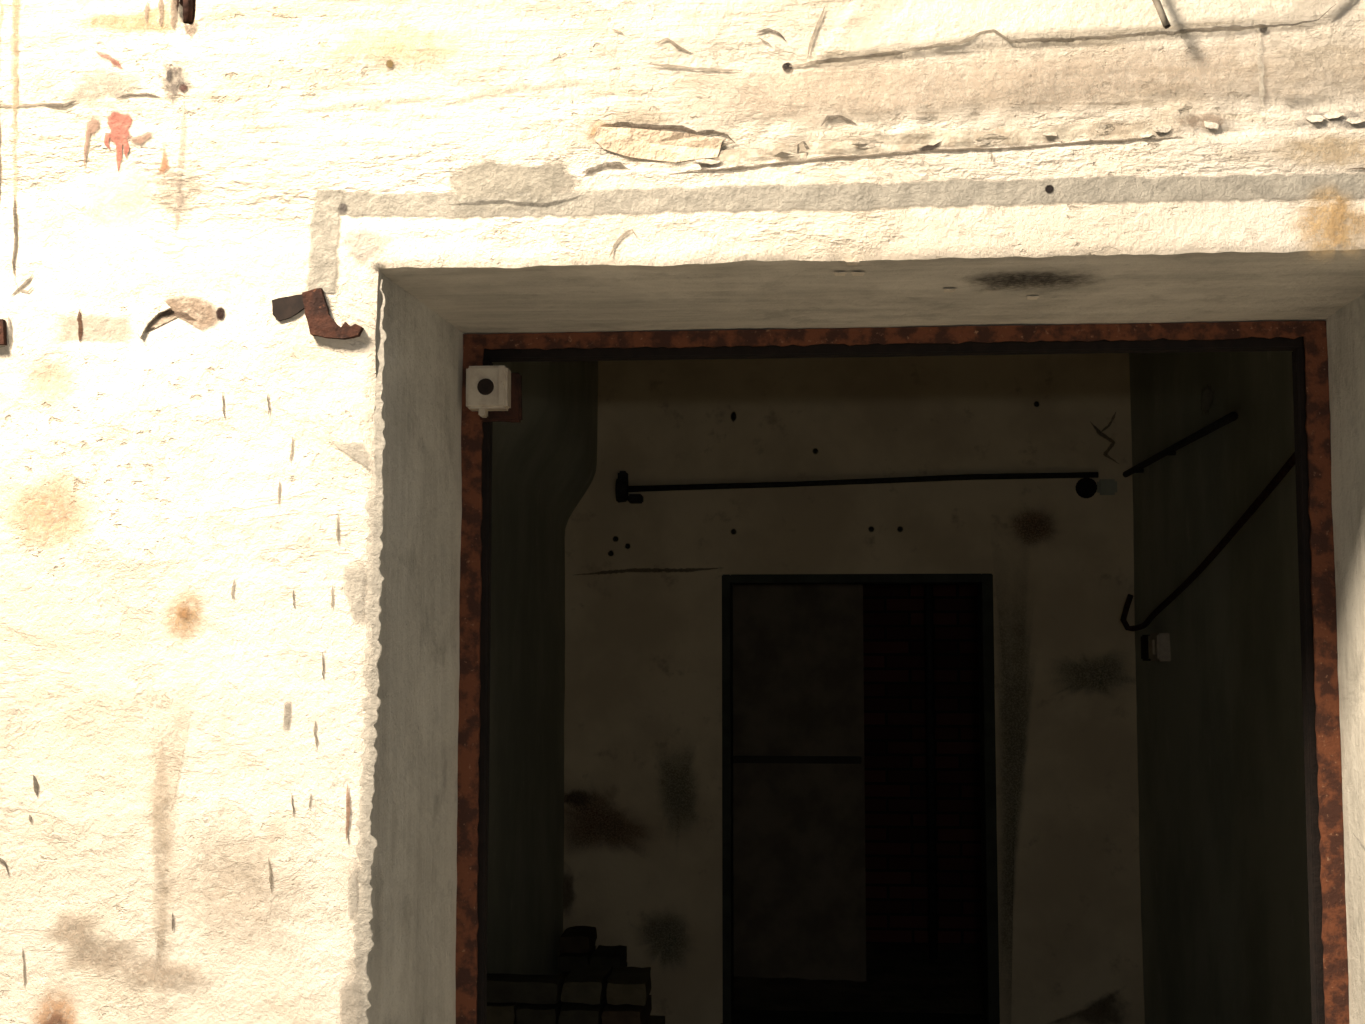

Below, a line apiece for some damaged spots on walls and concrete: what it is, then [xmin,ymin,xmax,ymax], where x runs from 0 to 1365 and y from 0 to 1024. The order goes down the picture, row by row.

corrosion [92,0,196,36]
corrosion [1302,196,1361,247]
corrosion [0,317,12,347]
corrosion [36,997,73,1024]